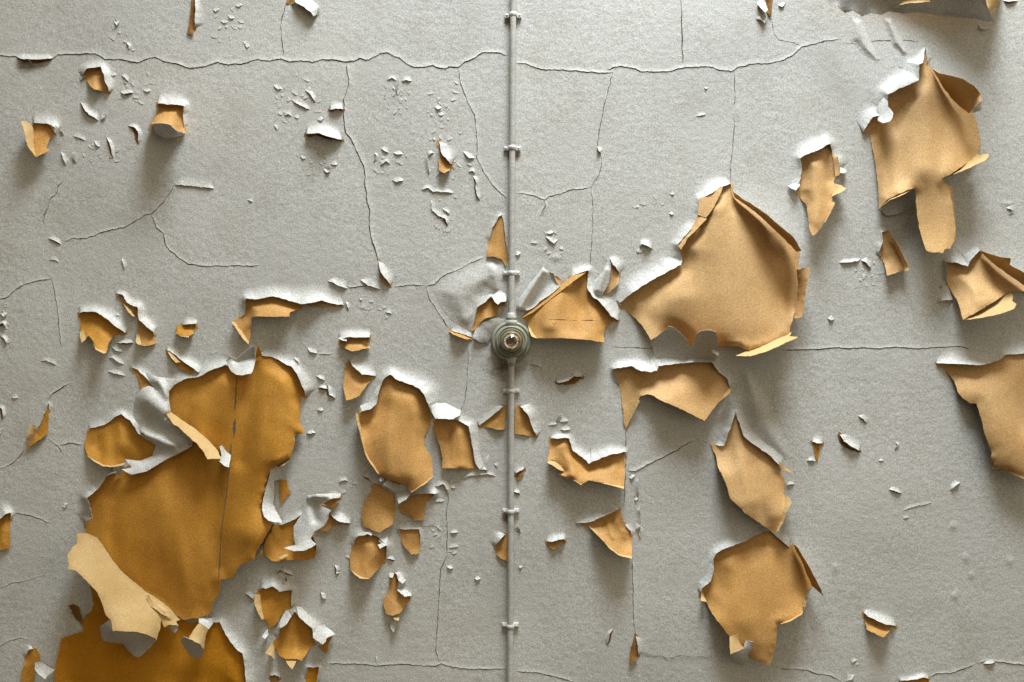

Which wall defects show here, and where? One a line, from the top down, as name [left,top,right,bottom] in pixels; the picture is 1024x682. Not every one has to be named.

peeling [21,58,192,167]
crack [0,0,915,267]
peeling [787,129,850,236]
peeling [839,46,1024,320]
peeling [20,257,644,682]
crack [395,255,484,414]
peeling [449,173,824,666]
crack [618,429,710,508]
crack [782,341,997,352]
peeling [934,342,1024,479]
crack [327,476,573,682]
crack [929,657,1024,677]